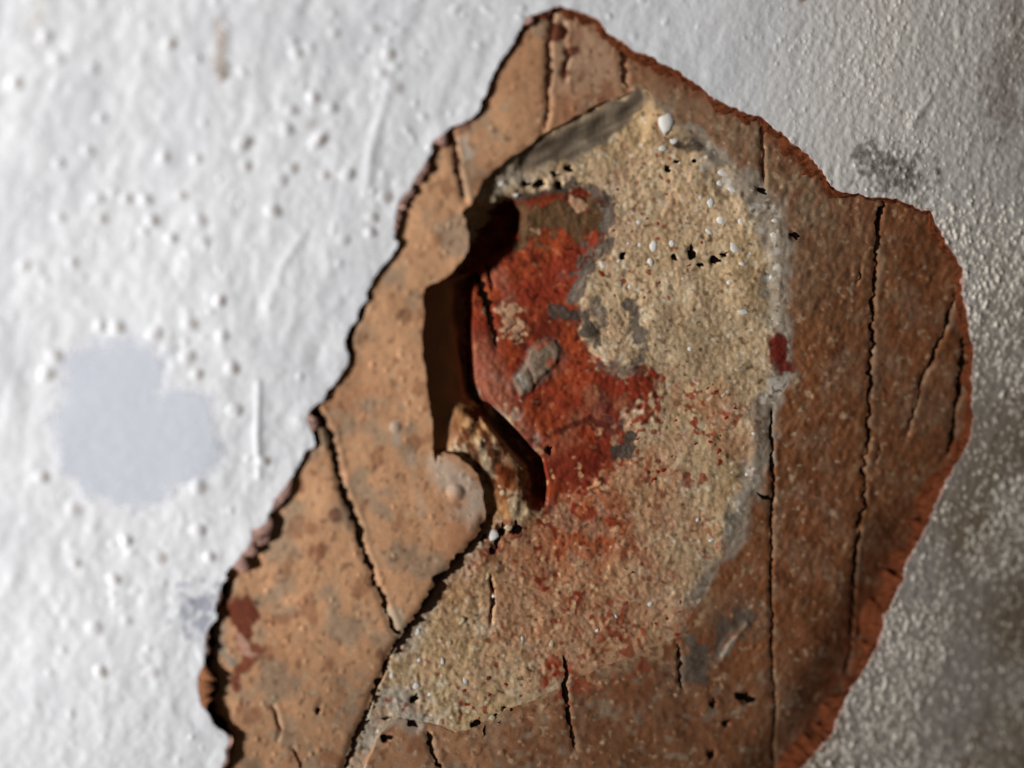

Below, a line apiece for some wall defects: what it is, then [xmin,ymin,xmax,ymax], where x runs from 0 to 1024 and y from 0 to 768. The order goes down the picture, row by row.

flaking render [197,6,976,768]
crack [756,407,776,767]
crack [845,201,885,672]
crack [907,291,966,456]